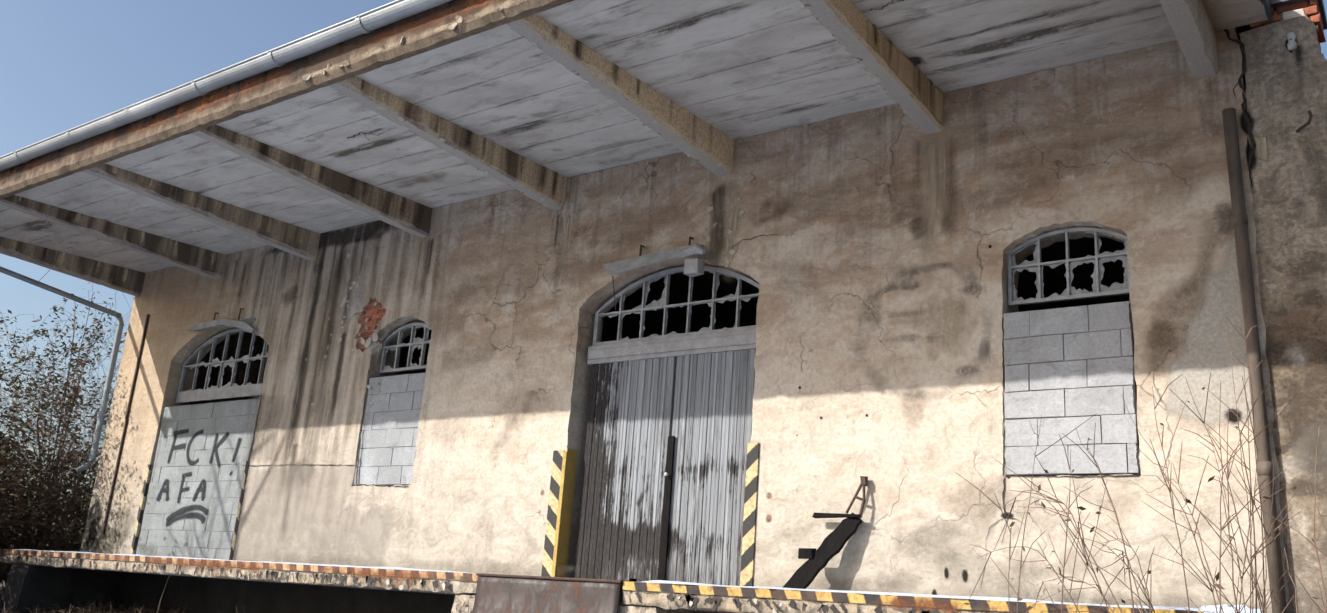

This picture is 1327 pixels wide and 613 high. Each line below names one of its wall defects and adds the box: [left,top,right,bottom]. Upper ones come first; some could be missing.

rust [102,56,305,142]
rust [0,160,40,183]
leakage [289,221,397,442]
flaking render [324,253,390,358]